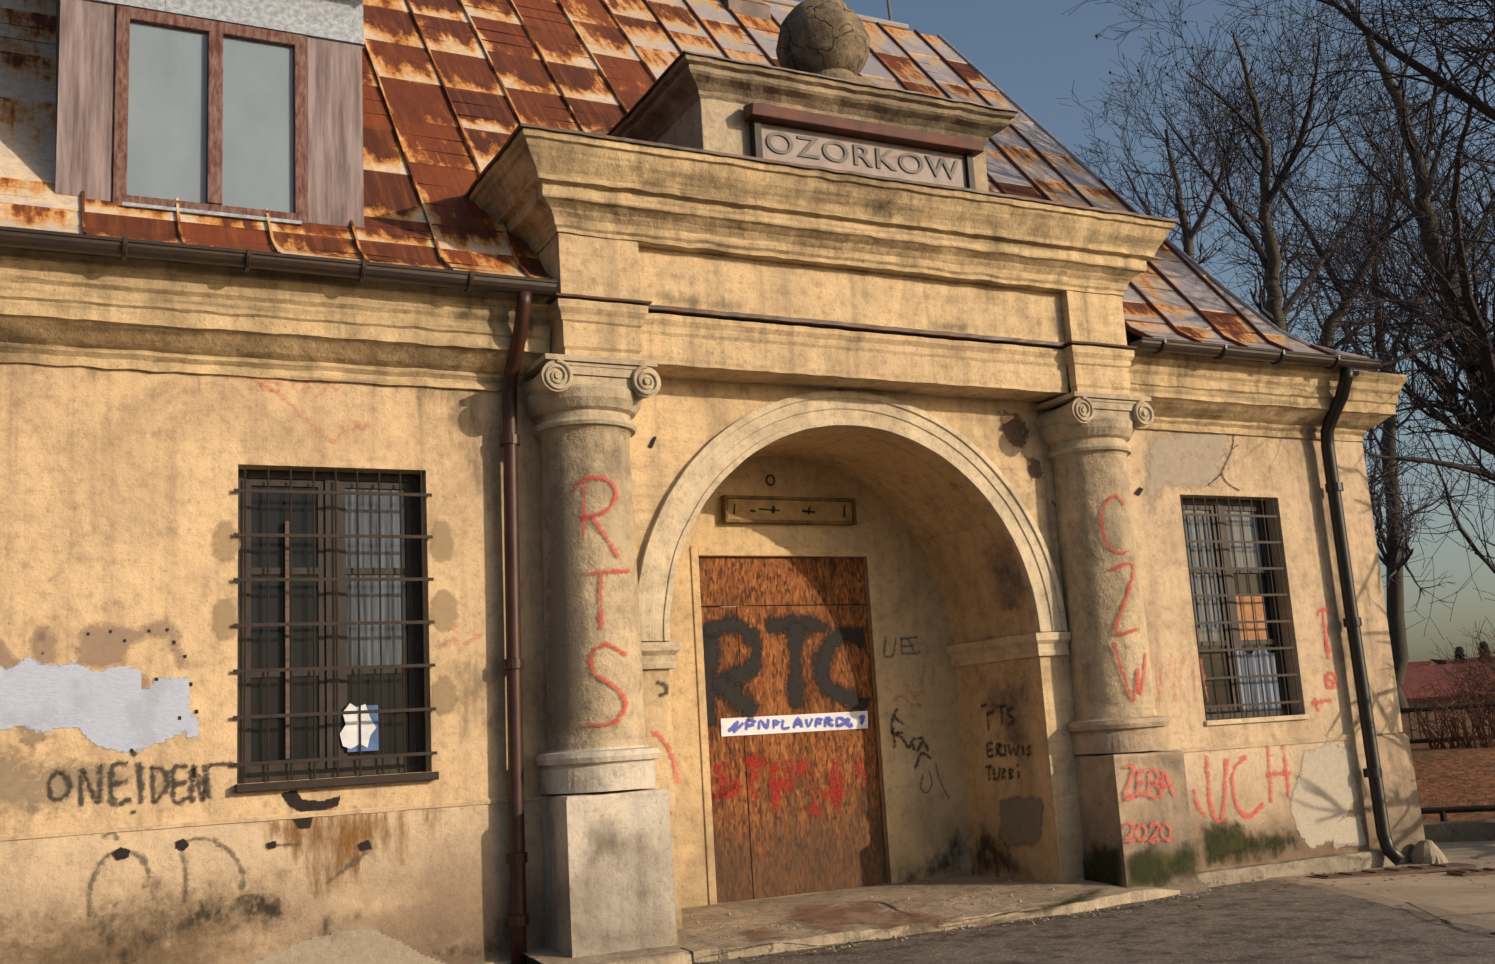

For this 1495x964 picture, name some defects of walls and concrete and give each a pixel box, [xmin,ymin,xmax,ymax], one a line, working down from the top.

crack [1208,435,1240,491]
peeling [0,652,199,753]
corrosion [286,814,404,881]